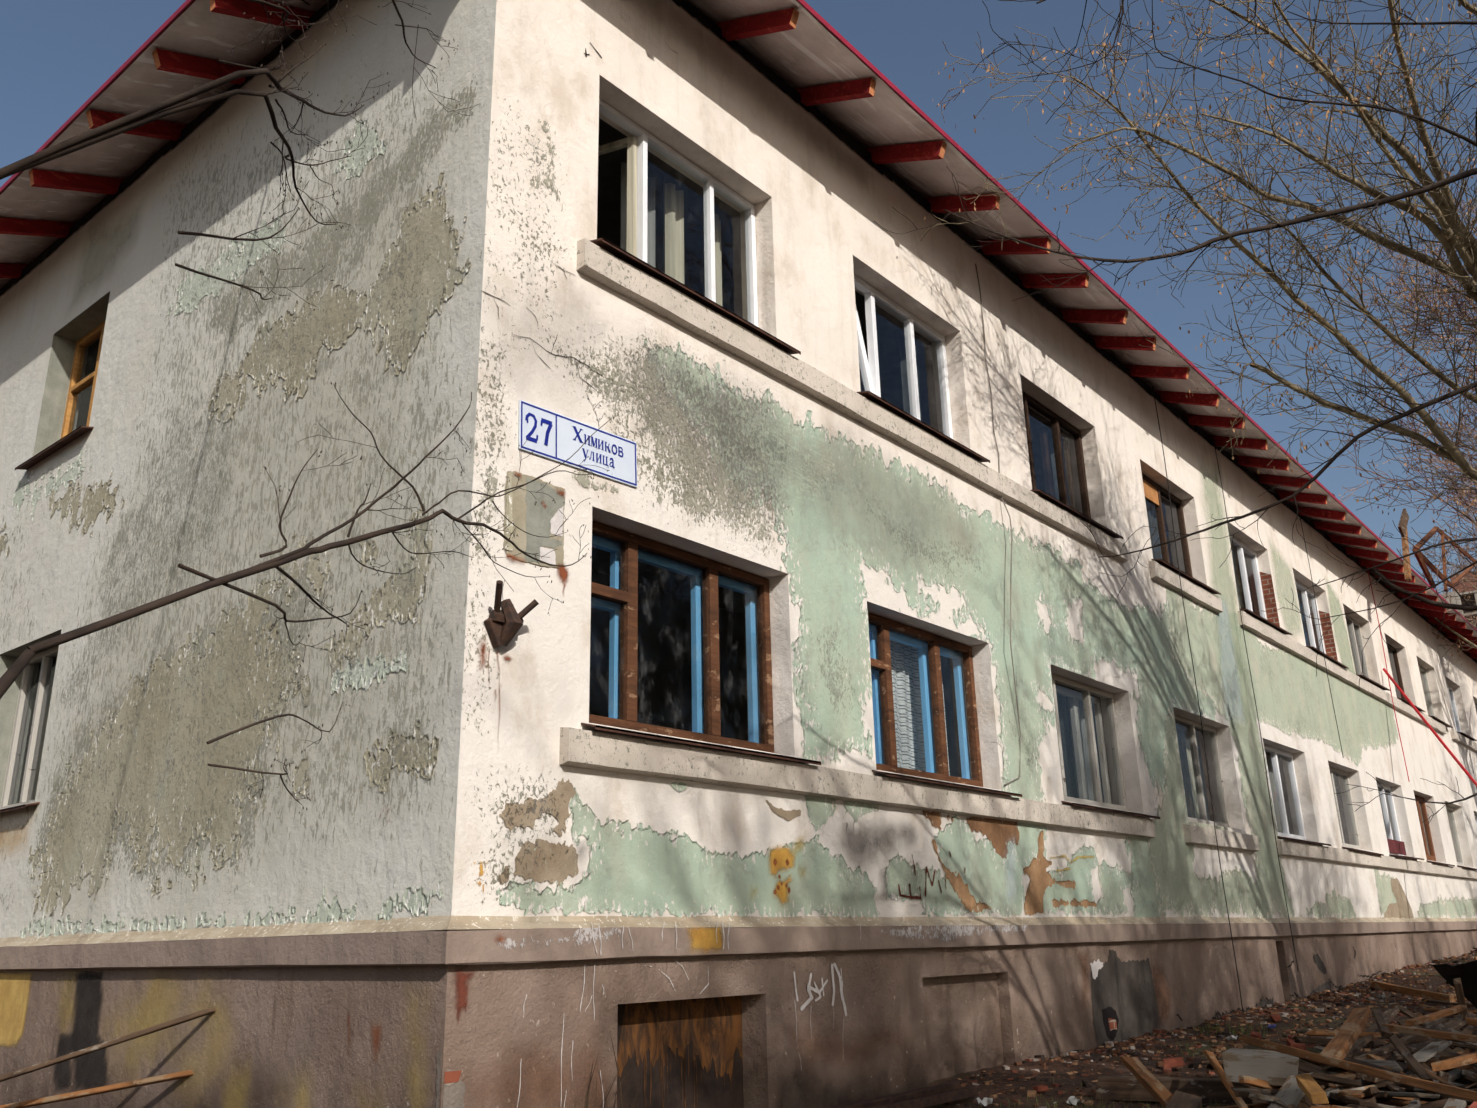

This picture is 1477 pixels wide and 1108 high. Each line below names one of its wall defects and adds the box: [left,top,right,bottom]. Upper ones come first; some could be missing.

peeling [335,117,386,185]
peeling [167,216,287,316]
peeling [208,171,474,431]
peeling [496,337,1398,918]
peeling [20,503,444,938]
peeling [1374,868,1477,918]
spalling [1102,1006,1119,1040]